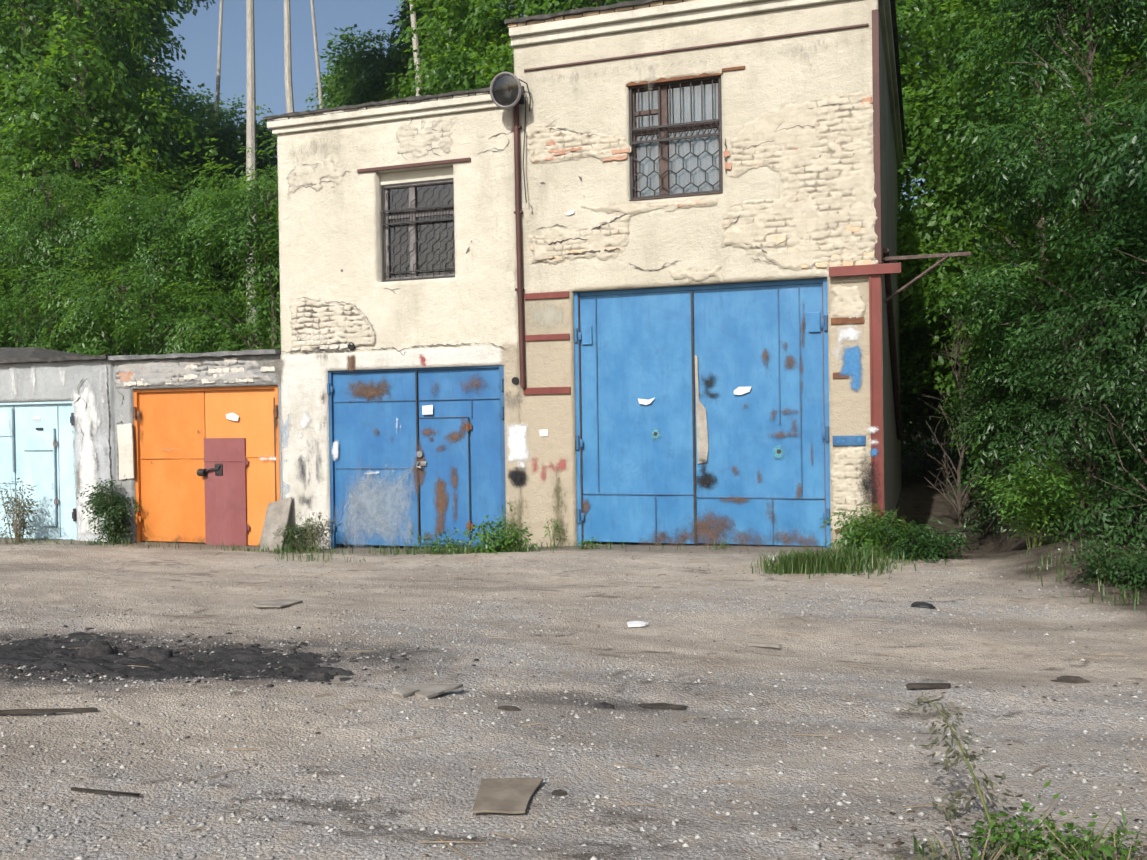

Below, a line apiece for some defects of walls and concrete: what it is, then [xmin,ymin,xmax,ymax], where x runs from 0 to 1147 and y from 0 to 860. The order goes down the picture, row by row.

flaking render [396,116,459,159]
flaking render [525,91,878,271]
flaking render [289,297,376,352]
flaking render [830,284,866,318]
corrosion [771,409,797,437]
corrosion [414,421,465,539]
flaking render [830,446,869,533]